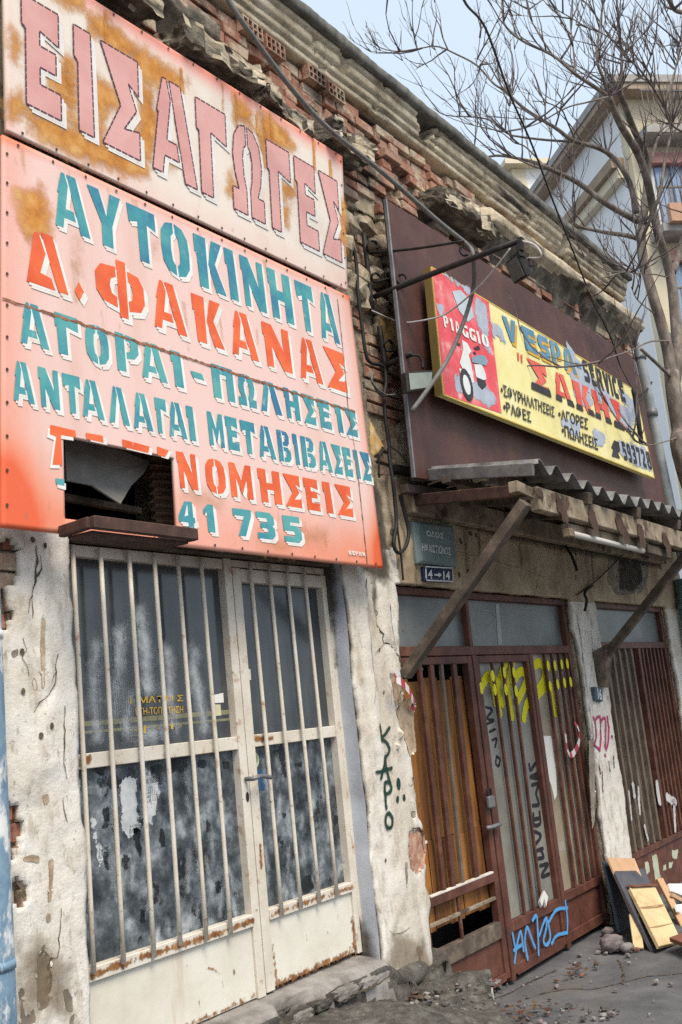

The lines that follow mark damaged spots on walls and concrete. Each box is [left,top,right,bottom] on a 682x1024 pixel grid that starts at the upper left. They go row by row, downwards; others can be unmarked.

flaking render [0,538,16,596]
crack [366,580,402,710]
crack [22,546,68,822]
flaking render [9,805,54,922]
flaking render [405,811,427,887]
corrosion [90,918,255,980]
corrosion [272,918,357,987]